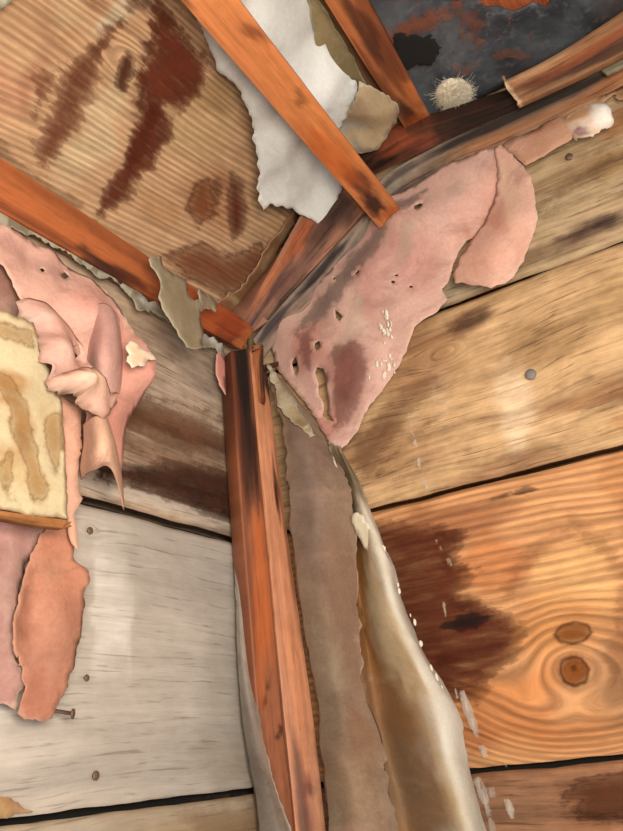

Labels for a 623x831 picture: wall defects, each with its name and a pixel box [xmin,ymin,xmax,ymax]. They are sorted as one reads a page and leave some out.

corrosion [387,2,481,41]
leakage [41,46,100,156]
leakage [97,0,204,215]
leakage [230,184,243,233]
leakage [171,243,262,292]
peeling [379,309,393,345]
leakage [378,527,516,697]